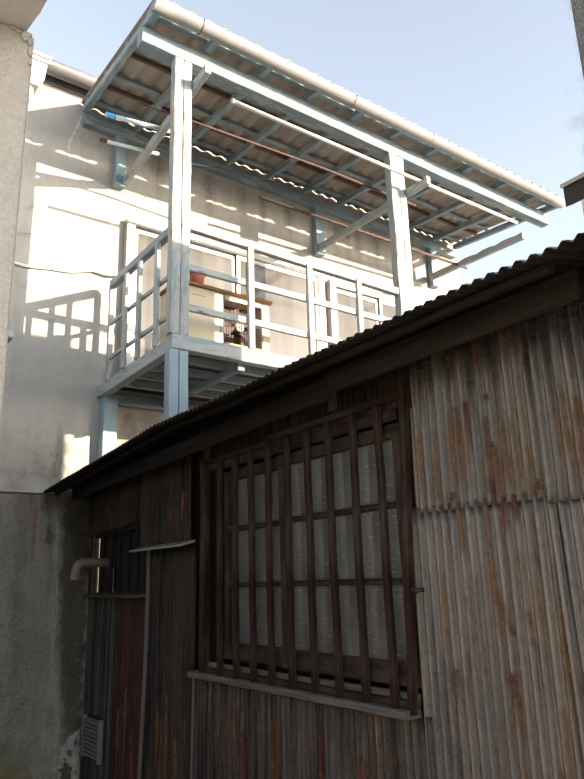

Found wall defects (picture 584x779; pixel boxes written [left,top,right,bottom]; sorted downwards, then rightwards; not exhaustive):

leakage [34,496,91,779]
flaking render [57,729,82,779]